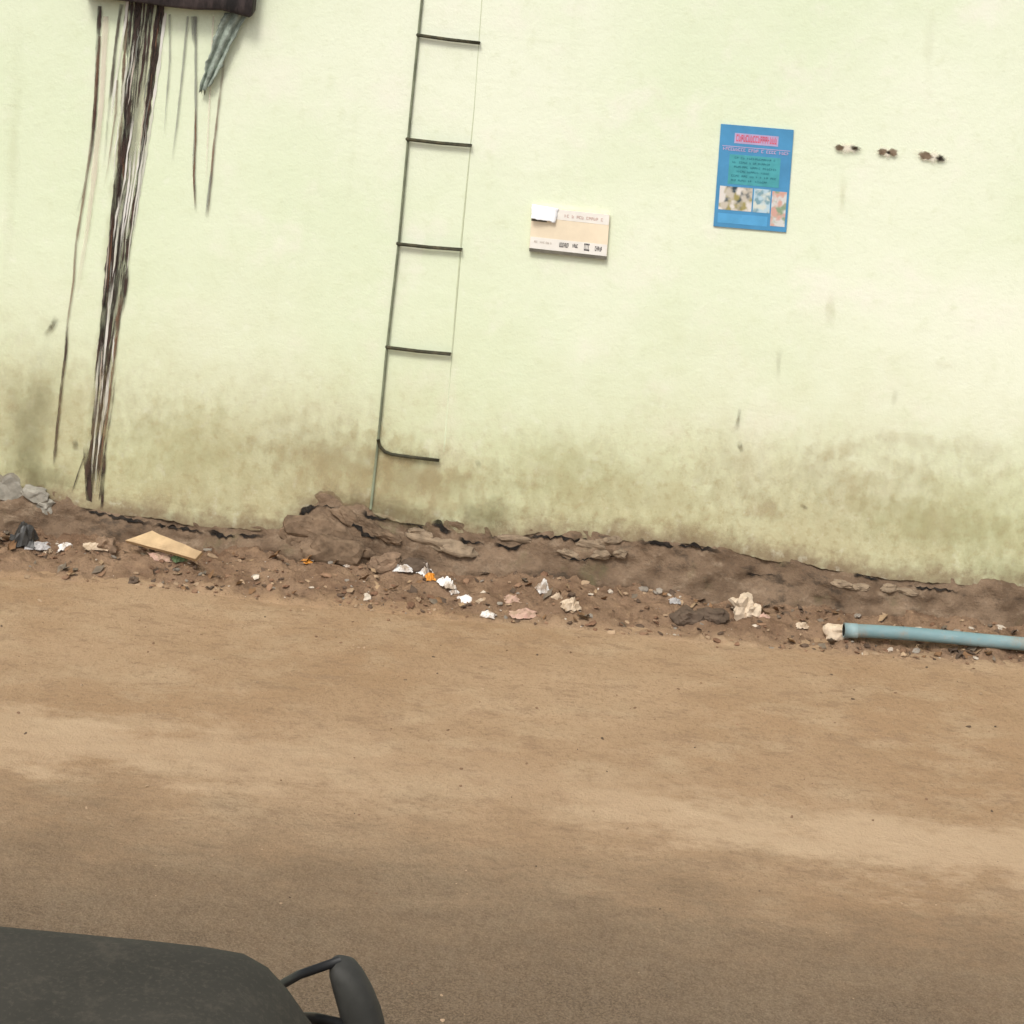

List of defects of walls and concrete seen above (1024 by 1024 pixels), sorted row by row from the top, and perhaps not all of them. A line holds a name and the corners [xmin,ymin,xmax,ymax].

spalling [878,148,897,157]
spalling [919,152,944,161]
water stain [53,332,68,458]